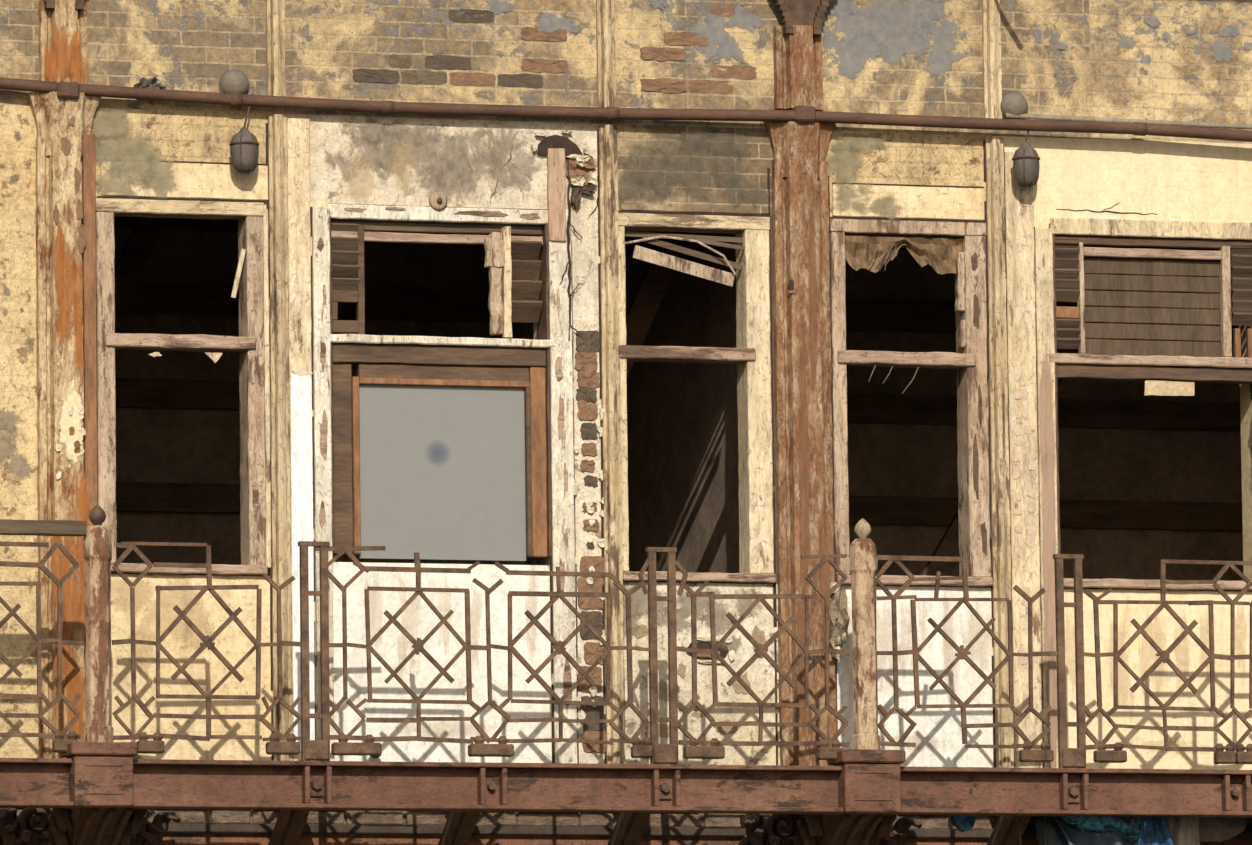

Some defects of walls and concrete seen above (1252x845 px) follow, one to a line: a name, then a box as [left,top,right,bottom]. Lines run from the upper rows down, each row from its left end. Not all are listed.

peeling [640,0,763,94]
peeling [61,115,75,156]
peeling [75,168,86,254]
crack [490,133,532,204]
spalling [55,379,86,480]
spalling [555,330,606,753]